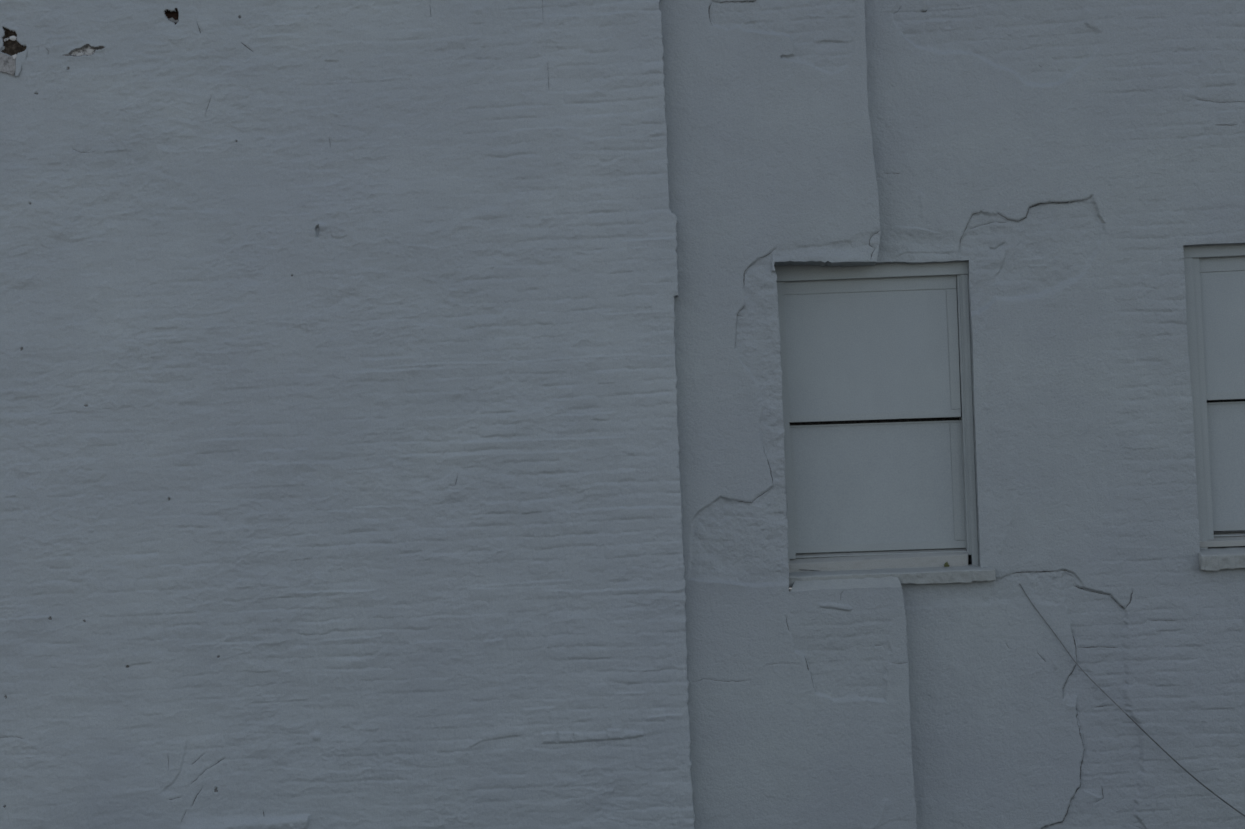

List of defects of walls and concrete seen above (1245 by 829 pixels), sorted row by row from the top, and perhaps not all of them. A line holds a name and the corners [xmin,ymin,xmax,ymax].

peeling [0,27,28,77]
flaking render [707,0,858,75]
flaking render [890,0,1103,88]
flaking render [688,194,1107,588]
crack [1010,570,1133,608]
crack [1006,629,1118,688]
crack [1043,705,1113,828]